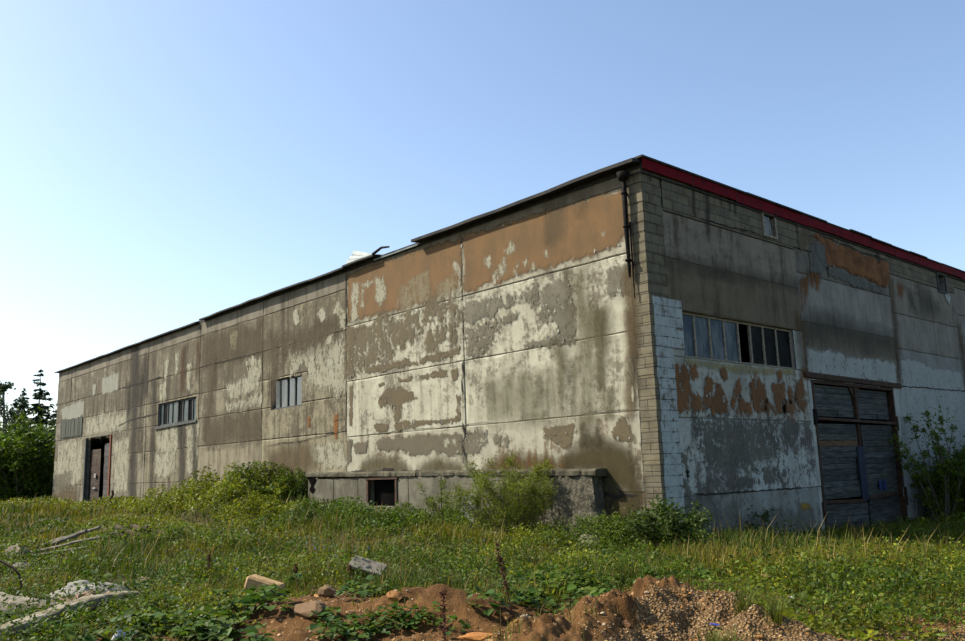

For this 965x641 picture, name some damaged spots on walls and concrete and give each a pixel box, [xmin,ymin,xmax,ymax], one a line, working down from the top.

damp [53,470,77,502]
damp [127,348,156,497]
peeling [226,355,262,413]
peeling [317,191,629,464]
damp [556,265,641,524]
peeling [675,362,809,500]